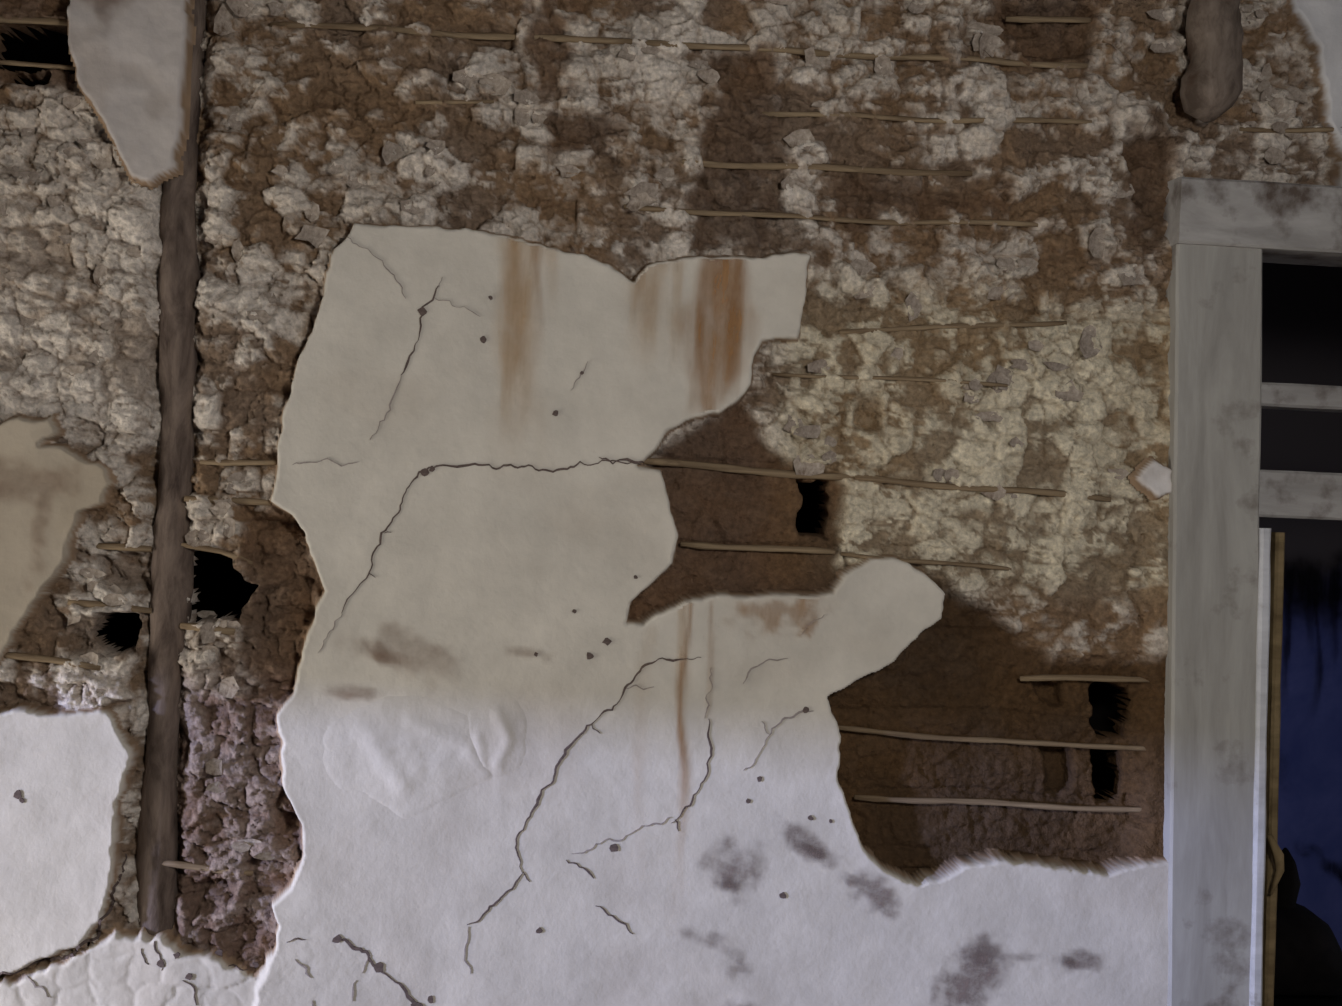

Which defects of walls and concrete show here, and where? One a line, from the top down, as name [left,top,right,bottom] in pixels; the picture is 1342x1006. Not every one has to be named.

spalling [1140,0,1335,194]
spalling [0,0,196,943]
crack [293,237,493,467]
crack [318,457,644,653]
crack [552,361,588,416]
spalling [162,0,1172,973]
crack [464,615,824,974]
leakage [788,829,824,858]
spalling [13,946,87,976]